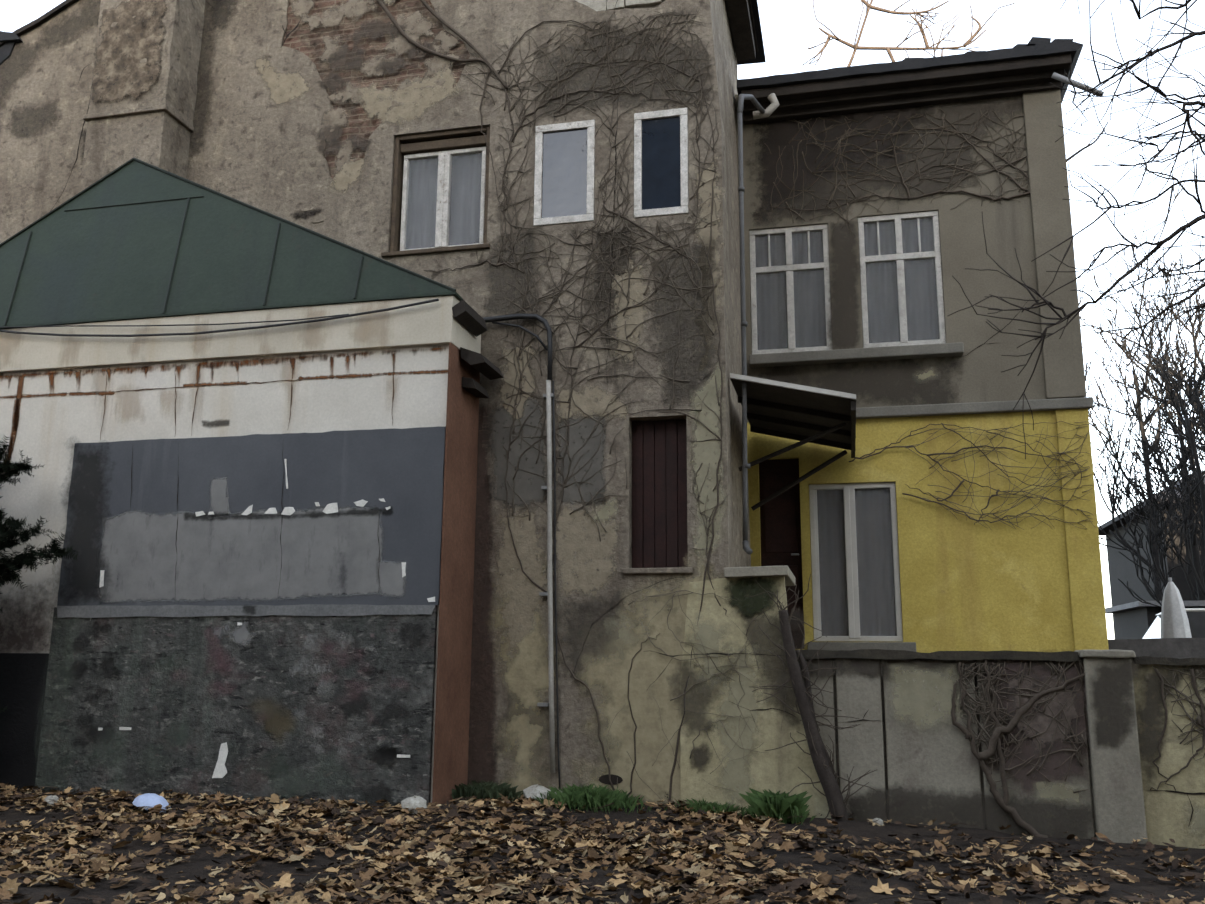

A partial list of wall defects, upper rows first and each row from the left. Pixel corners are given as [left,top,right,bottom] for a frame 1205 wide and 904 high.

leakage [0,0,101,138]
spalling [256,0,470,191]
rust [0,351,448,460]
peeling [99,478,406,602]
peeling [212,742,228,778]
leakage [673,662,727,731]
leakage [732,605,1205,839]